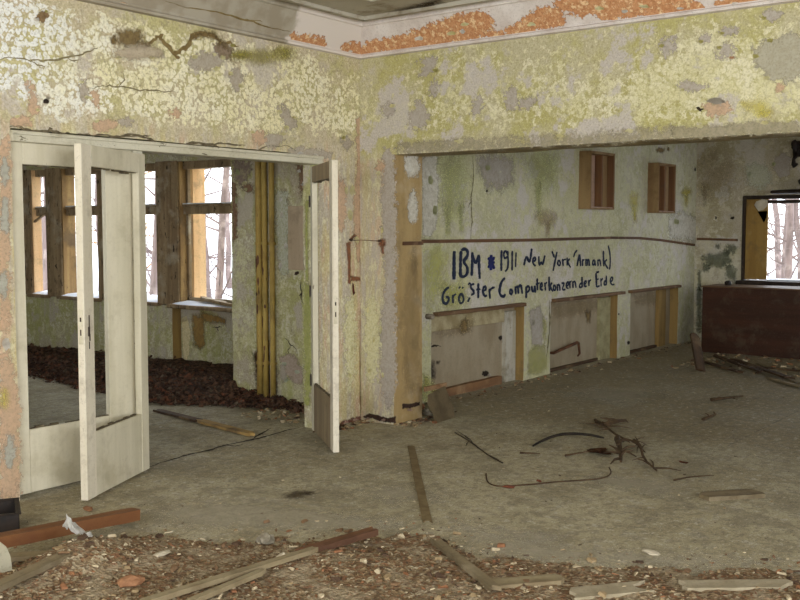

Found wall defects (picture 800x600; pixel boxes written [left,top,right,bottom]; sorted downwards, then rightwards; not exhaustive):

spalling [34,10,49,23]
crack [0,48,97,67]
crack [92,73,175,93]
crack [136,31,238,59]
spalling [188,42,247,92]
peeling [340,0,755,54]
spalling [751,31,800,93]
crack [467,165,475,228]
peeling [0,80,50,499]
rust [346,234,360,295]
damp [696,244,736,333]
crack [150,427,300,467]